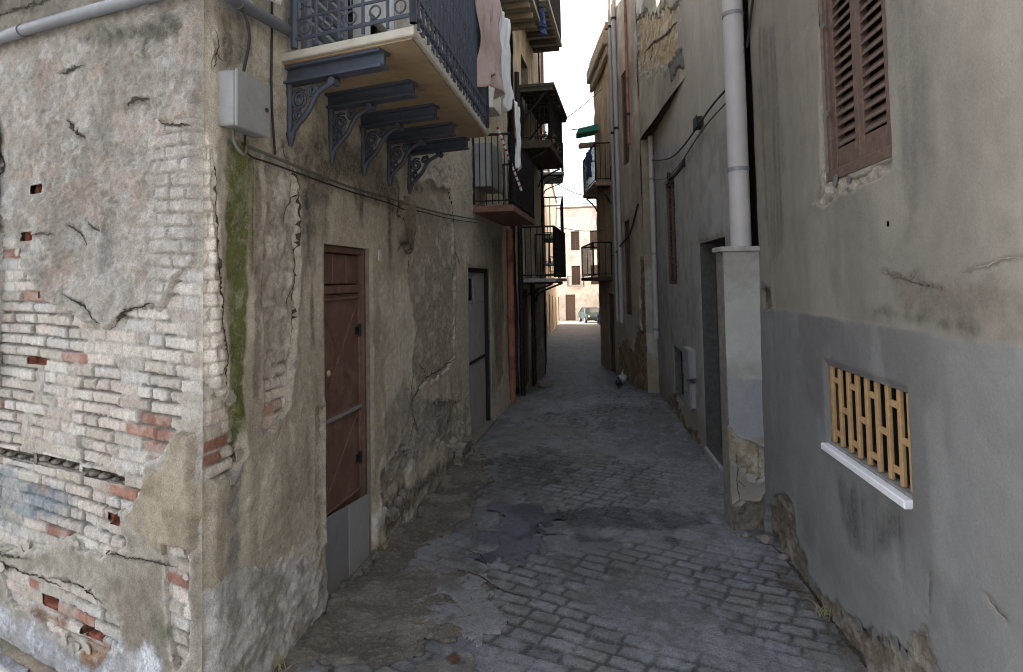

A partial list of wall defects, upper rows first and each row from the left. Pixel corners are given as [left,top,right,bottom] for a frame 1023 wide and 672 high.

spalling [636,0,681,78]
crack [67,120,85,139]
crack [127,96,190,127]
spalling [817,139,892,205]
crack [882,272,938,289]
flaking render [0,217,244,556]
spalling [727,422,765,483]
crack [0,554,103,604]
flaking render [0,562,120,655]
crack [105,550,176,567]
spalling [167,546,191,665]
spalling [730,495,941,672]